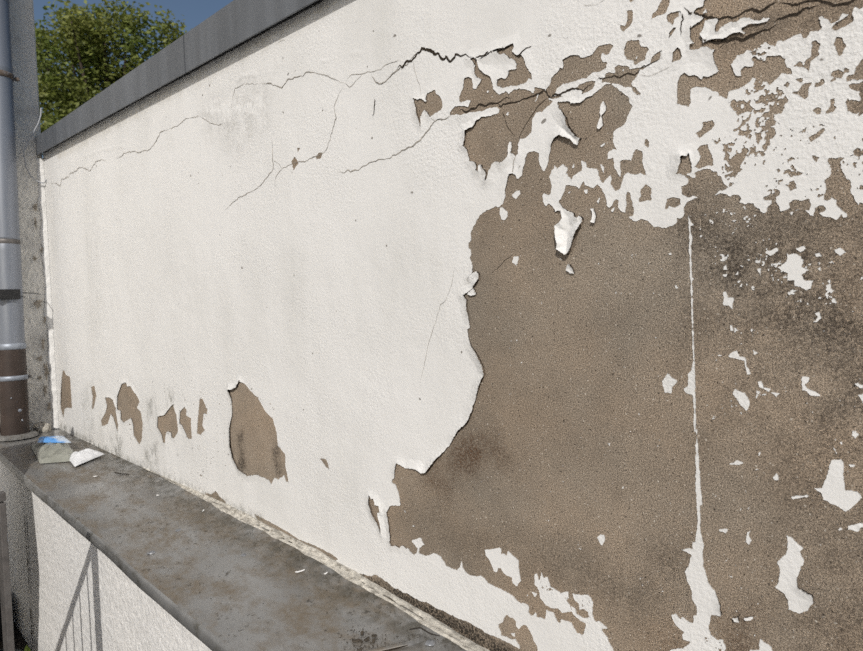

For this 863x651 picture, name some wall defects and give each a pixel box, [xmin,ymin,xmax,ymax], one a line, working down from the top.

crack [680,0,854,44]
crack [55,116,221,186]
crack [229,44,531,206]
crack [342,60,662,173]
peeling [360,0,863,651]
peeling [91,383,143,444]
peeling [158,397,207,451]
peeling [230,382,288,484]